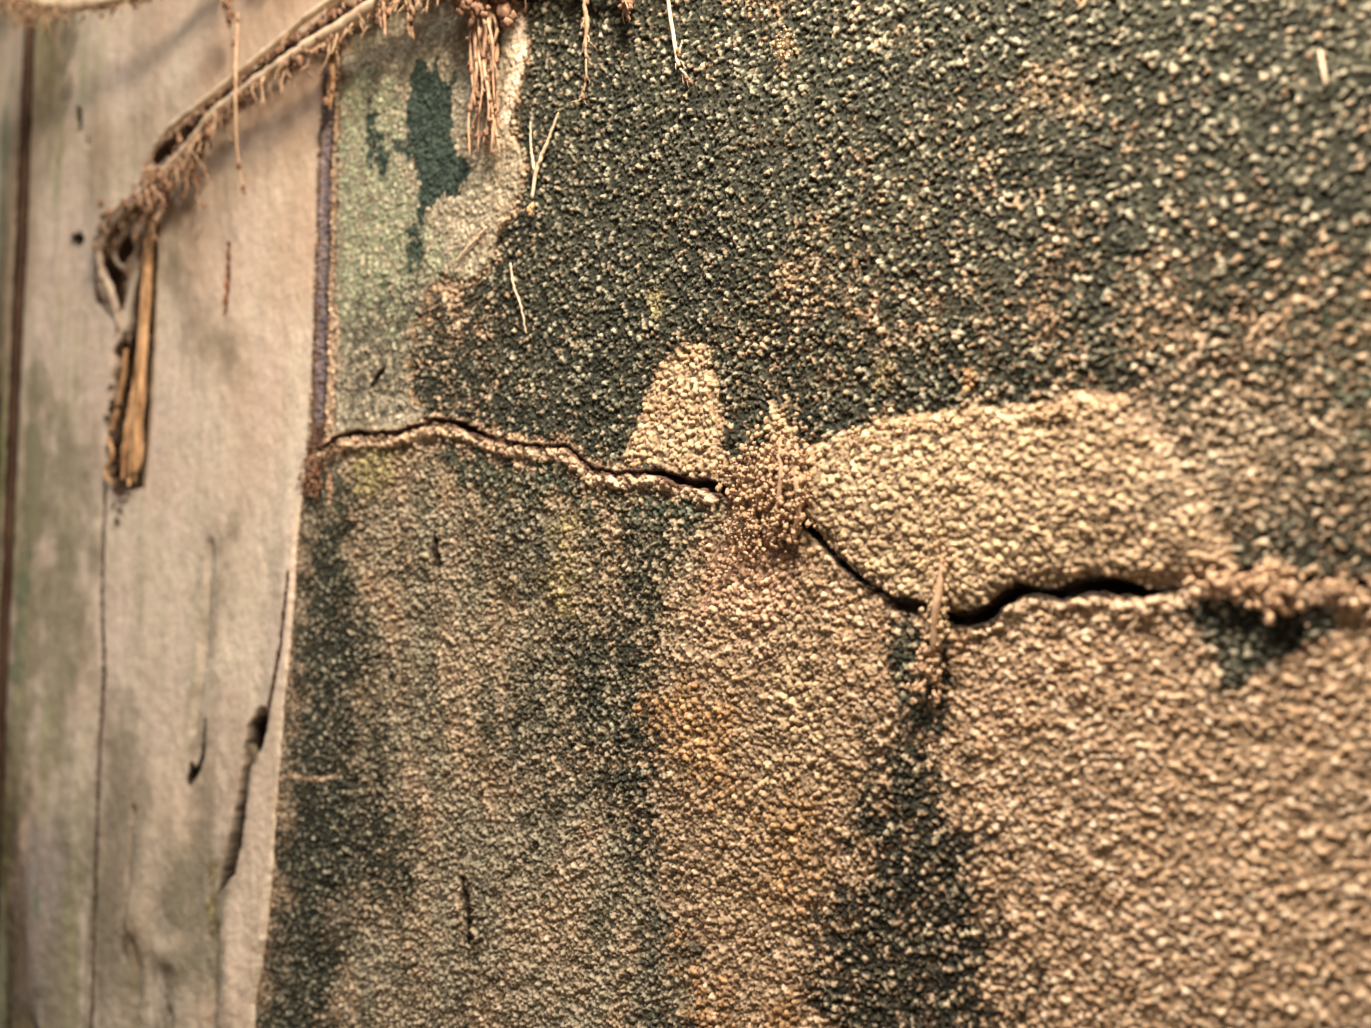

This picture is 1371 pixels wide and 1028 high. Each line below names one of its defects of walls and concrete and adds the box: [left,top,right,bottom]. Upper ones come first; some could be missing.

crack [431,530,442,567]
leakage [484,495,559,609]
crack [801,520,1371,629]
leakage [883,612,960,757]
leakage [446,639,581,1028]